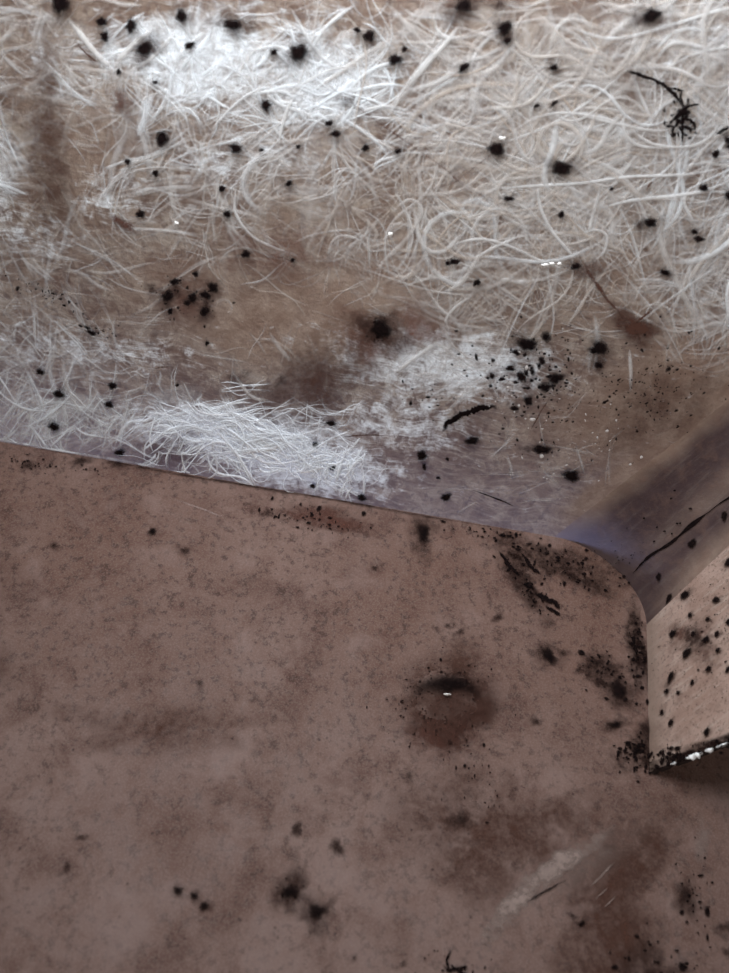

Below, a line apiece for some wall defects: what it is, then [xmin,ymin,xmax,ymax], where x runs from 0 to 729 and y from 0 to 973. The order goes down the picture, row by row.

mould [136,37,159,61]
mould [218,15,252,32]
mould [271,44,307,62]
damp [494,1,512,44]
damp [633,8,662,22]
mould [628,71,701,142]
mould [552,161,572,175]
mould [138,466,459,548]
crack [633,497,729,573]
damp [466,527,643,615]
mould [578,612,652,706]
damp [669,588,729,672]